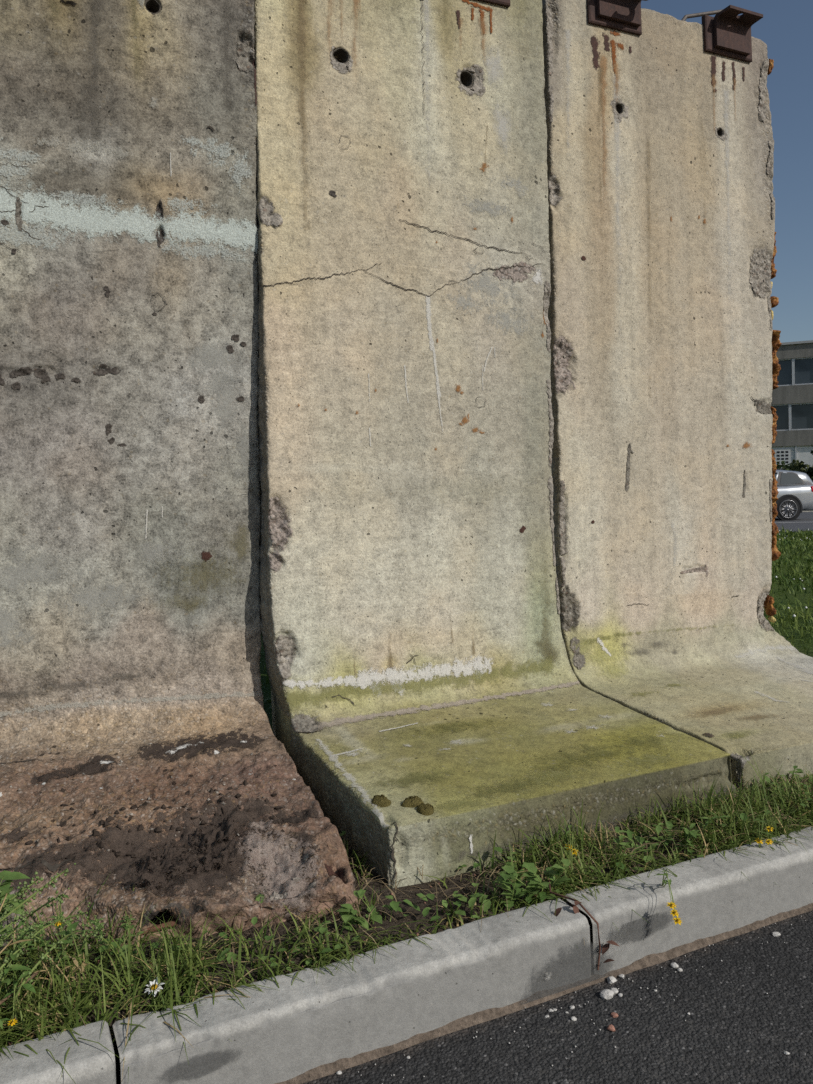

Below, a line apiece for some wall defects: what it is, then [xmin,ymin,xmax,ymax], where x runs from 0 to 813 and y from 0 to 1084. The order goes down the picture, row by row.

corrosion [456,0,493,47]
corrosion [591,31,632,115]
corrosion [710,56,745,92]
crack [0,162,49,251]
crack [263,219,544,297]
spalling [493,261,536,283]
spalling [749,246,773,330]
spalling [268,497,293,572]
leakage [316,739,389,827]
spalling [233,820,320,920]